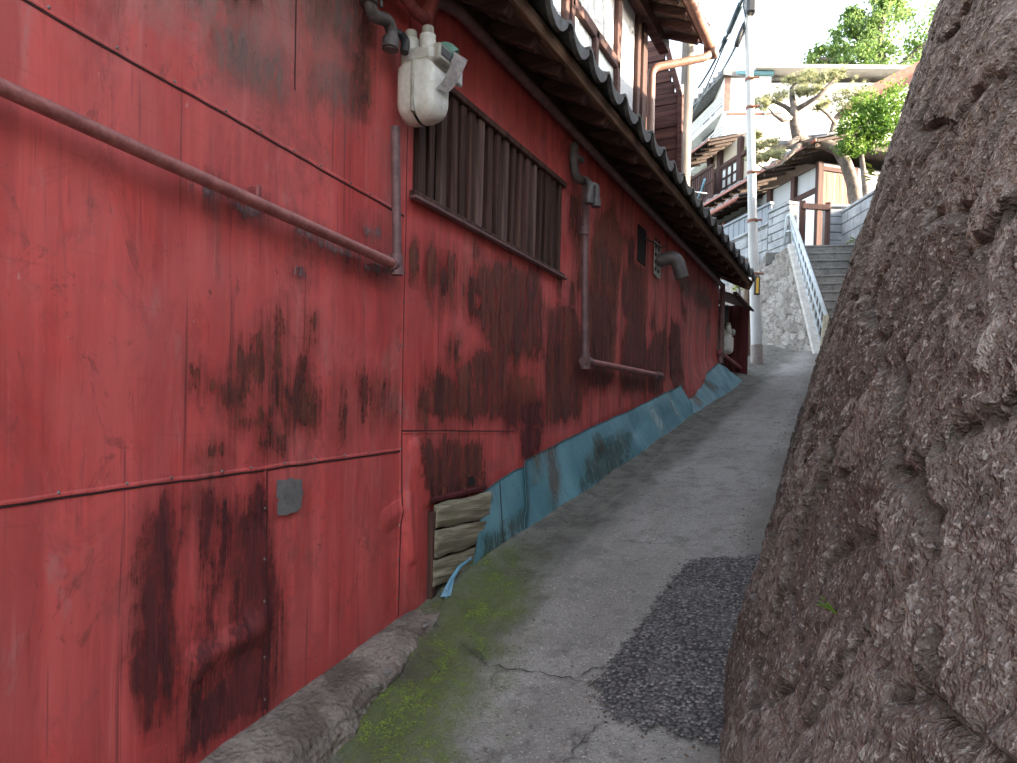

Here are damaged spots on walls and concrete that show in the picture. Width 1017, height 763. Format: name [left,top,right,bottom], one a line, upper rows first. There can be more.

rust [129,481,284,763]